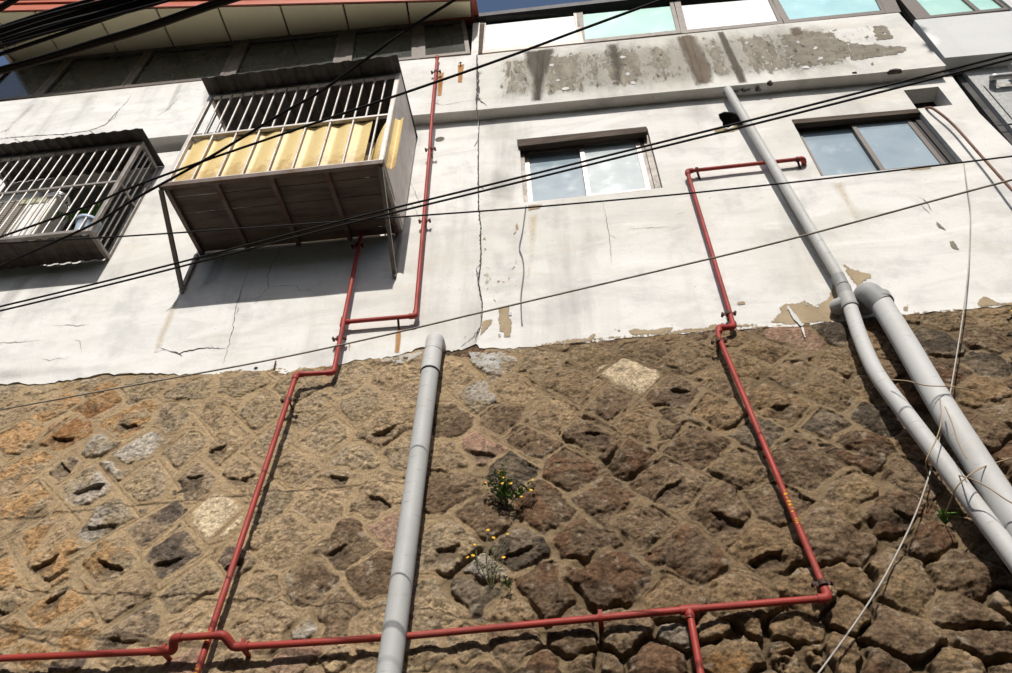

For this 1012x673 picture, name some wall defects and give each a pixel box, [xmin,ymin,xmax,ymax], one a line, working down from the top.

damp [609,44,627,77]
damp [677,35,716,84]
damp [718,32,761,94]
crack [437,57,487,347]
peeling [736,166,841,329]
peeling [844,265,871,286]
crack [158,246,303,363]
peeling [480,306,512,337]
peeling [536,324,719,346]